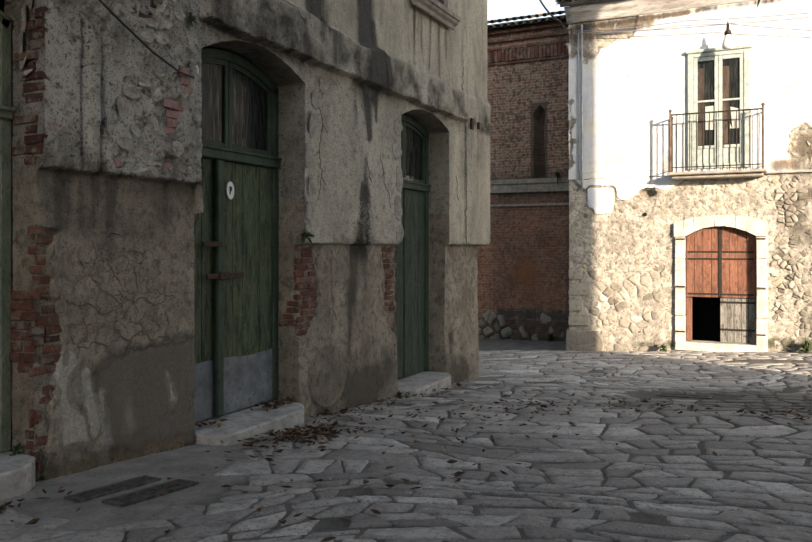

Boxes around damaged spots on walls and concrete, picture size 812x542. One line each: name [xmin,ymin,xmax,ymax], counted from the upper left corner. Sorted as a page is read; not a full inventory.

spalling [13,0,50,104]
damp [310,0,341,63]
damp [355,0,393,142]
spalling [11,114,48,165]
spalling [380,118,404,335]
peeling [576,176,683,214]
damp [784,200,800,226]
damp [774,134,812,170]
spalling [9,226,72,377]
crack [64,231,187,372]
spalling [278,244,323,341]
damp [37,351,195,481]